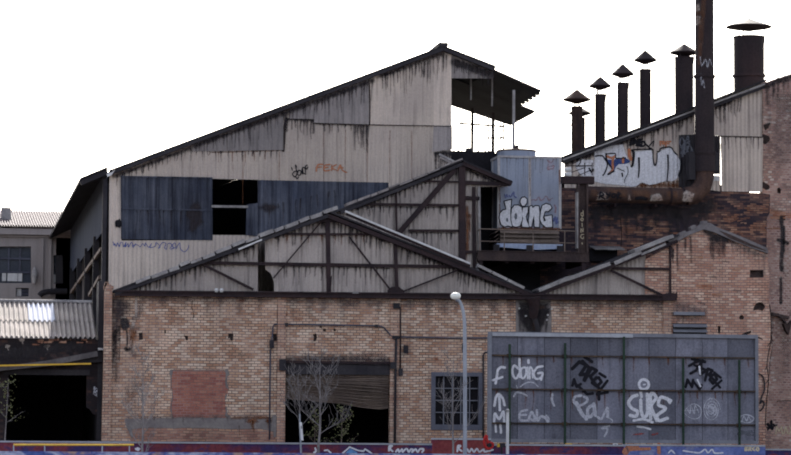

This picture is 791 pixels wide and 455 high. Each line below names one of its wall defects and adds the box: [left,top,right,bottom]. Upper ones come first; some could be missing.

leakage [113,51,494,183]
spalling [721,203,791,310]